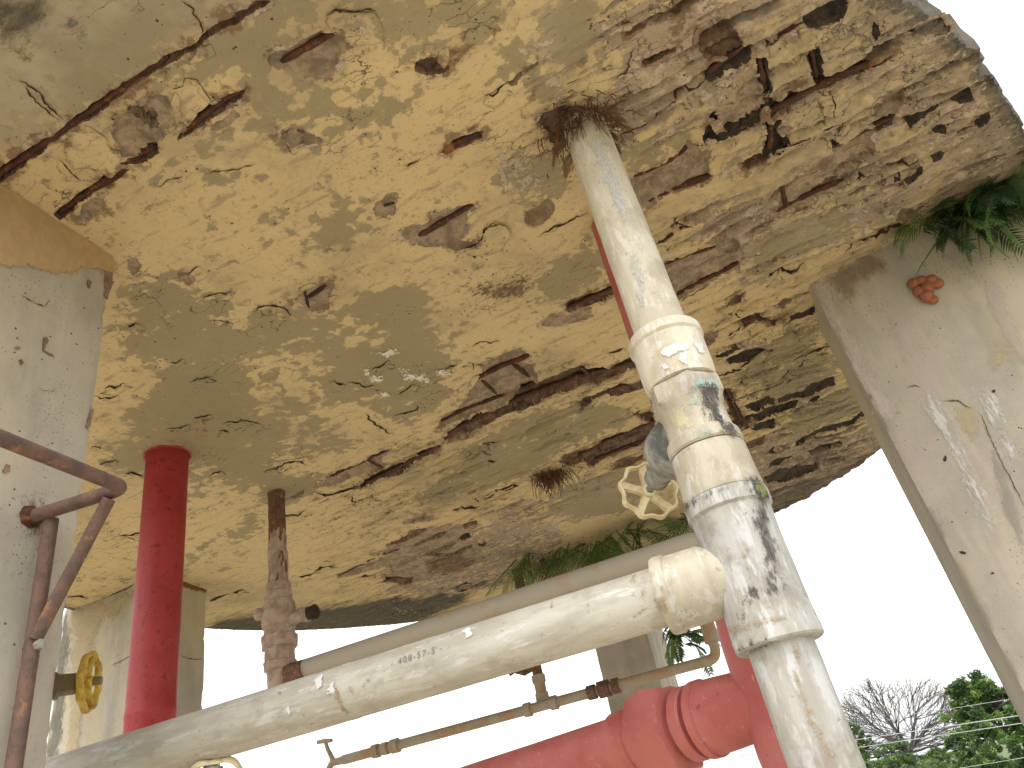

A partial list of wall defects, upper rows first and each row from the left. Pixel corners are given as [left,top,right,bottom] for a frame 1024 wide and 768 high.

crack [20,81,64,120]
spalling [0,0,278,226]
spalling [409,44,456,80]
rust [438,143,457,156]
spalling [620,0,900,211]
spalling [759,85,995,225]
spalling [291,278,339,316]
spalling [663,226,744,302]
peeling [703,289,817,366]
spalling [285,346,657,500]
spalling [723,375,864,485]
crack [947,400,1024,505]